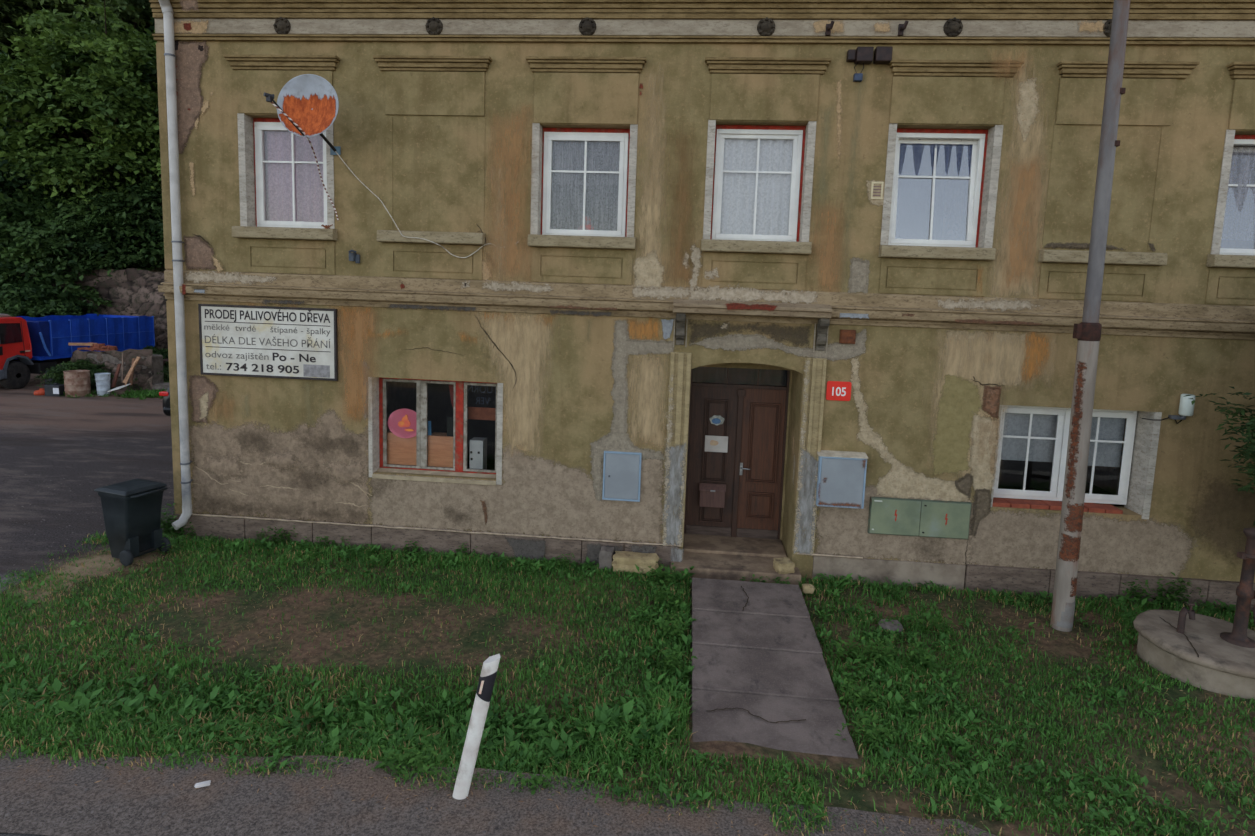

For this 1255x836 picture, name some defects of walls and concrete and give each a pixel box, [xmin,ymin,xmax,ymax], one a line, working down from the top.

spalling [174,0,213,196]
peeling [189,261,687,546]
peeling [792,360,819,556]
peeling [933,297,1061,570]
peeling [1078,514,1196,578]